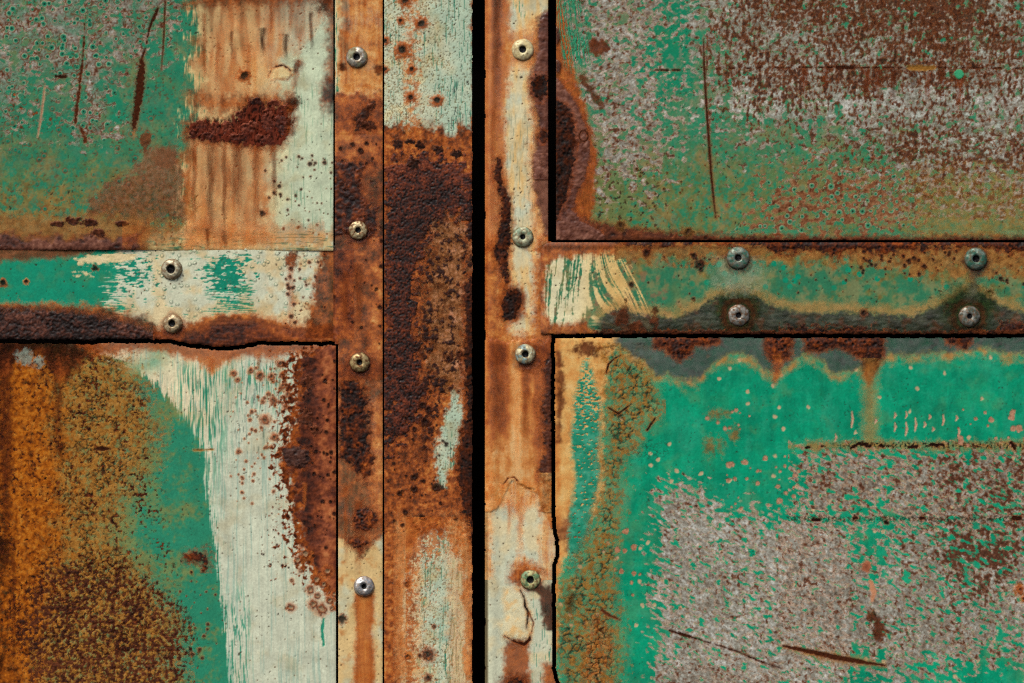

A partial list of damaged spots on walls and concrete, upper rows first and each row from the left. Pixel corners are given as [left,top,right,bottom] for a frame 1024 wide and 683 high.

peeling [0,349,209,682]
peeling [74,254,136,277]
rust [0,0,473,683]
spalling [230,361,336,505]
spalling [285,254,335,329]
rust [470,0,1024,650]
peeling [559,0,1024,276]
peeling [614,410,1024,683]